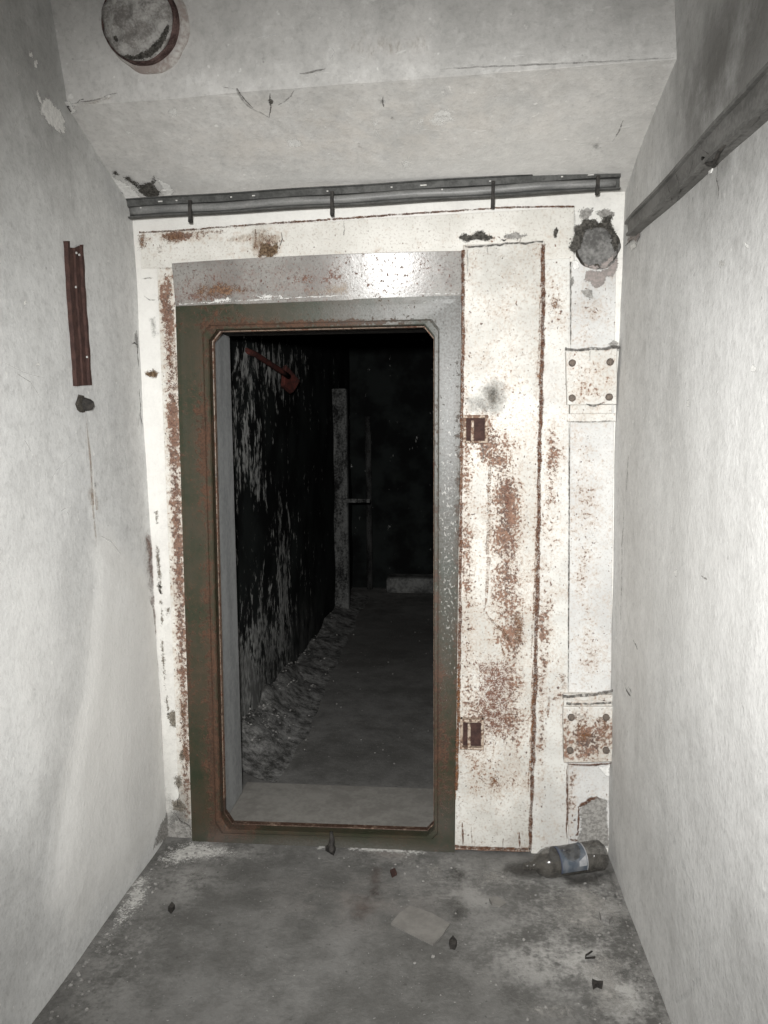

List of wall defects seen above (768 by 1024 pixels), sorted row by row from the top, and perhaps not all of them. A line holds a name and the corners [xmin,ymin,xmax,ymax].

peeling [36,90,76,134]
crack [225,69,323,119]
flaking render [112,171,175,198]
corrosion [138,205,575,249]
flaking render [569,207,640,298]
corrosion [160,287,190,770]
corrosion [454,241,575,851]
corrosion [146,536,156,632]
spalling [571,796,609,847]